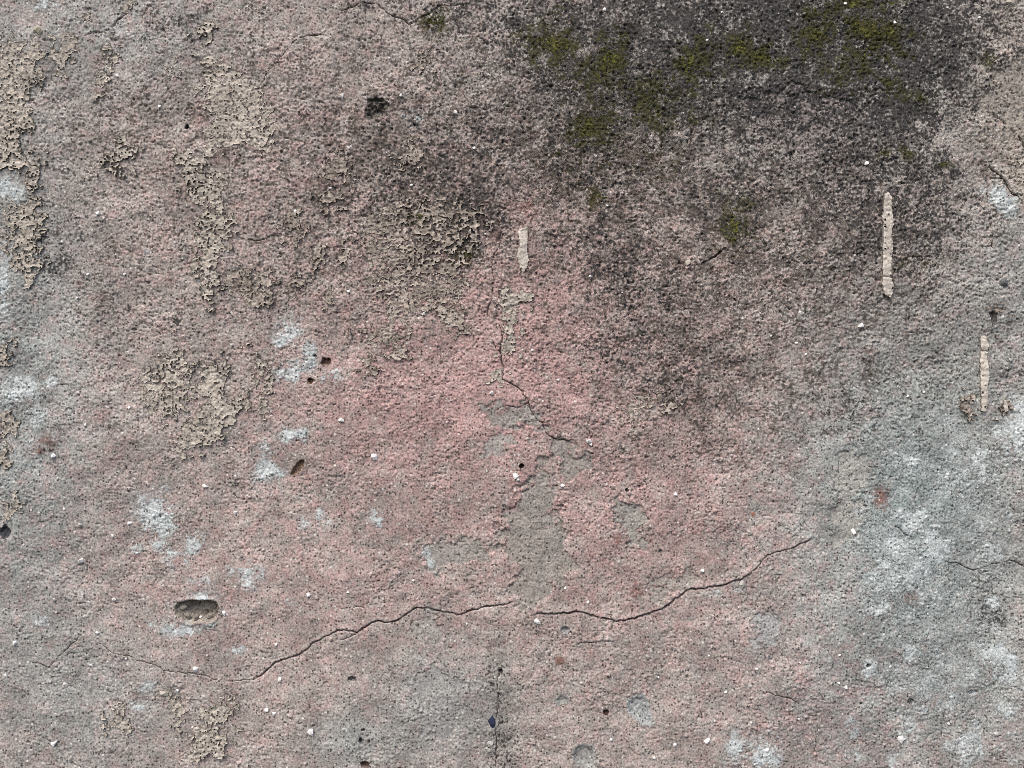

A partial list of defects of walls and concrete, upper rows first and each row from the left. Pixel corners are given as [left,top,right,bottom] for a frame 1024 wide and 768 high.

peeling [0,30,78,289]
peeling [128,342,276,460]
water stain [252,256,327,298]
peeling [170,20,494,378]
crack [466,232,569,442]
water stain [317,0,1024,465]
crack [32,602,511,685]
crack [537,540,809,643]